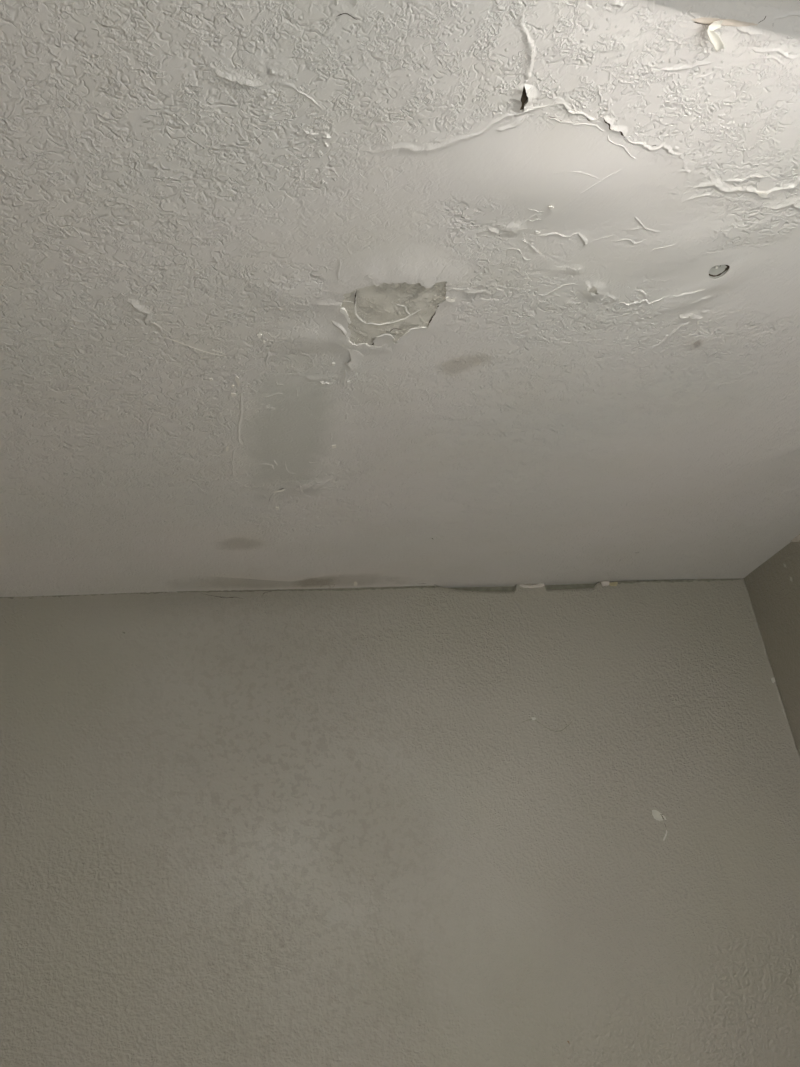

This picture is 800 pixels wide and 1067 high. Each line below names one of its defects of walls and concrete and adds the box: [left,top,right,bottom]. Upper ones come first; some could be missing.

crack [370,6,800,211]
peeling [312,242,488,387]